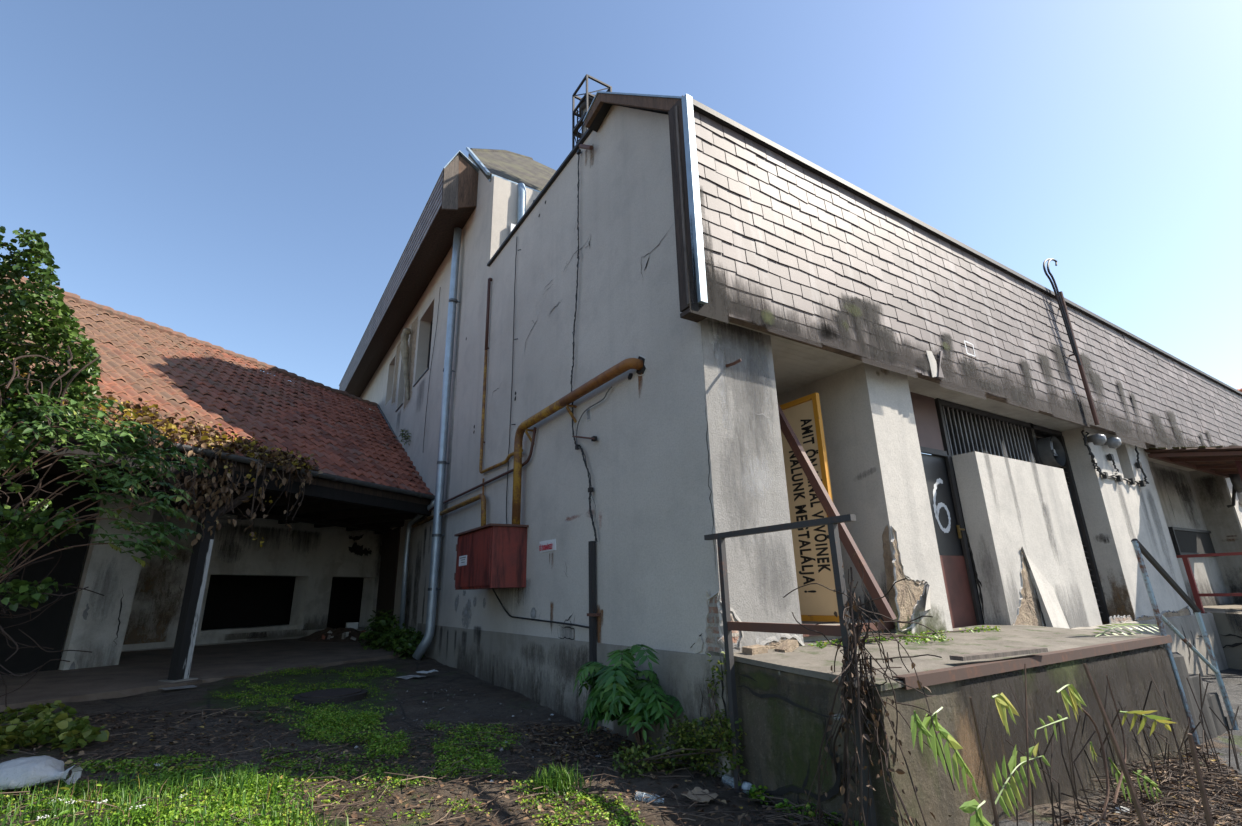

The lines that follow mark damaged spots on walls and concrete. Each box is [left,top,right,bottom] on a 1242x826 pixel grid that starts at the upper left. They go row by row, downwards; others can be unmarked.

damp [689,258,729,323]
rust [559,358,643,407]
damp [751,297,1205,449]
spalling [882,524,931,632]
spalling [1013,548,1070,629]
spalling [692,590,744,656]
spalling [758,633,805,649]